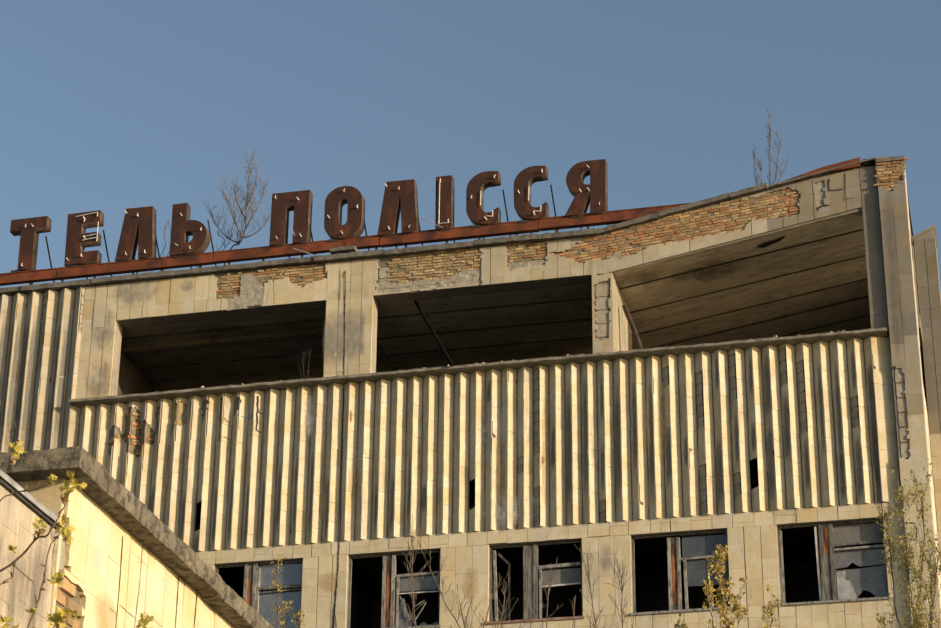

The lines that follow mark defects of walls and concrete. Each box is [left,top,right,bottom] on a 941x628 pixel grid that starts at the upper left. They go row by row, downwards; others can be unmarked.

spalling [873,156,908,192]
spalling [506,187,801,270]
spalling [216,264,328,311]
spalling [376,247,483,293]
spalling [107,402,186,457]
leakage [543,424,555,464]
leakage [649,399,671,492]
leakage [836,378,845,497]
leakage [869,377,882,502]
leakage [309,463,329,533]
spalling [51,523,82,628]